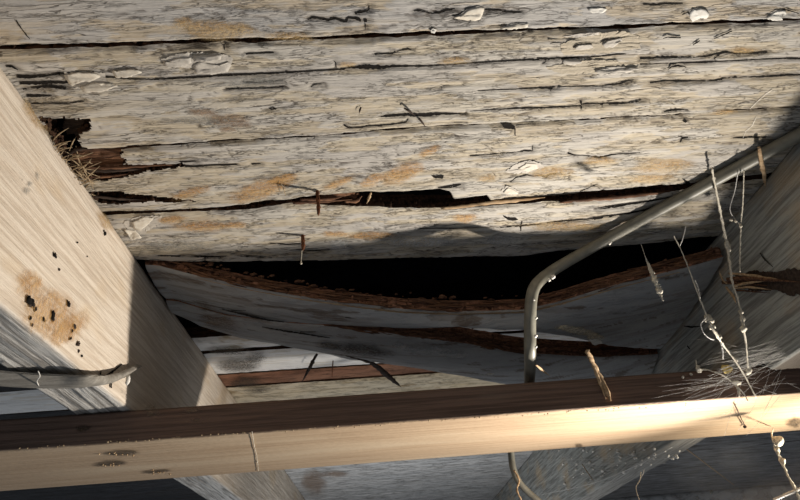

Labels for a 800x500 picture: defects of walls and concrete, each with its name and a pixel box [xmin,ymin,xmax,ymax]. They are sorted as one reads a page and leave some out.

peeling [689,8,709,22]
peeling [161,52,233,75]
peeling [64,69,142,93]
crack [104,31,800,128]
crack [180,160,260,168]
crack [505,173,595,199]
peeling [124,215,162,240]